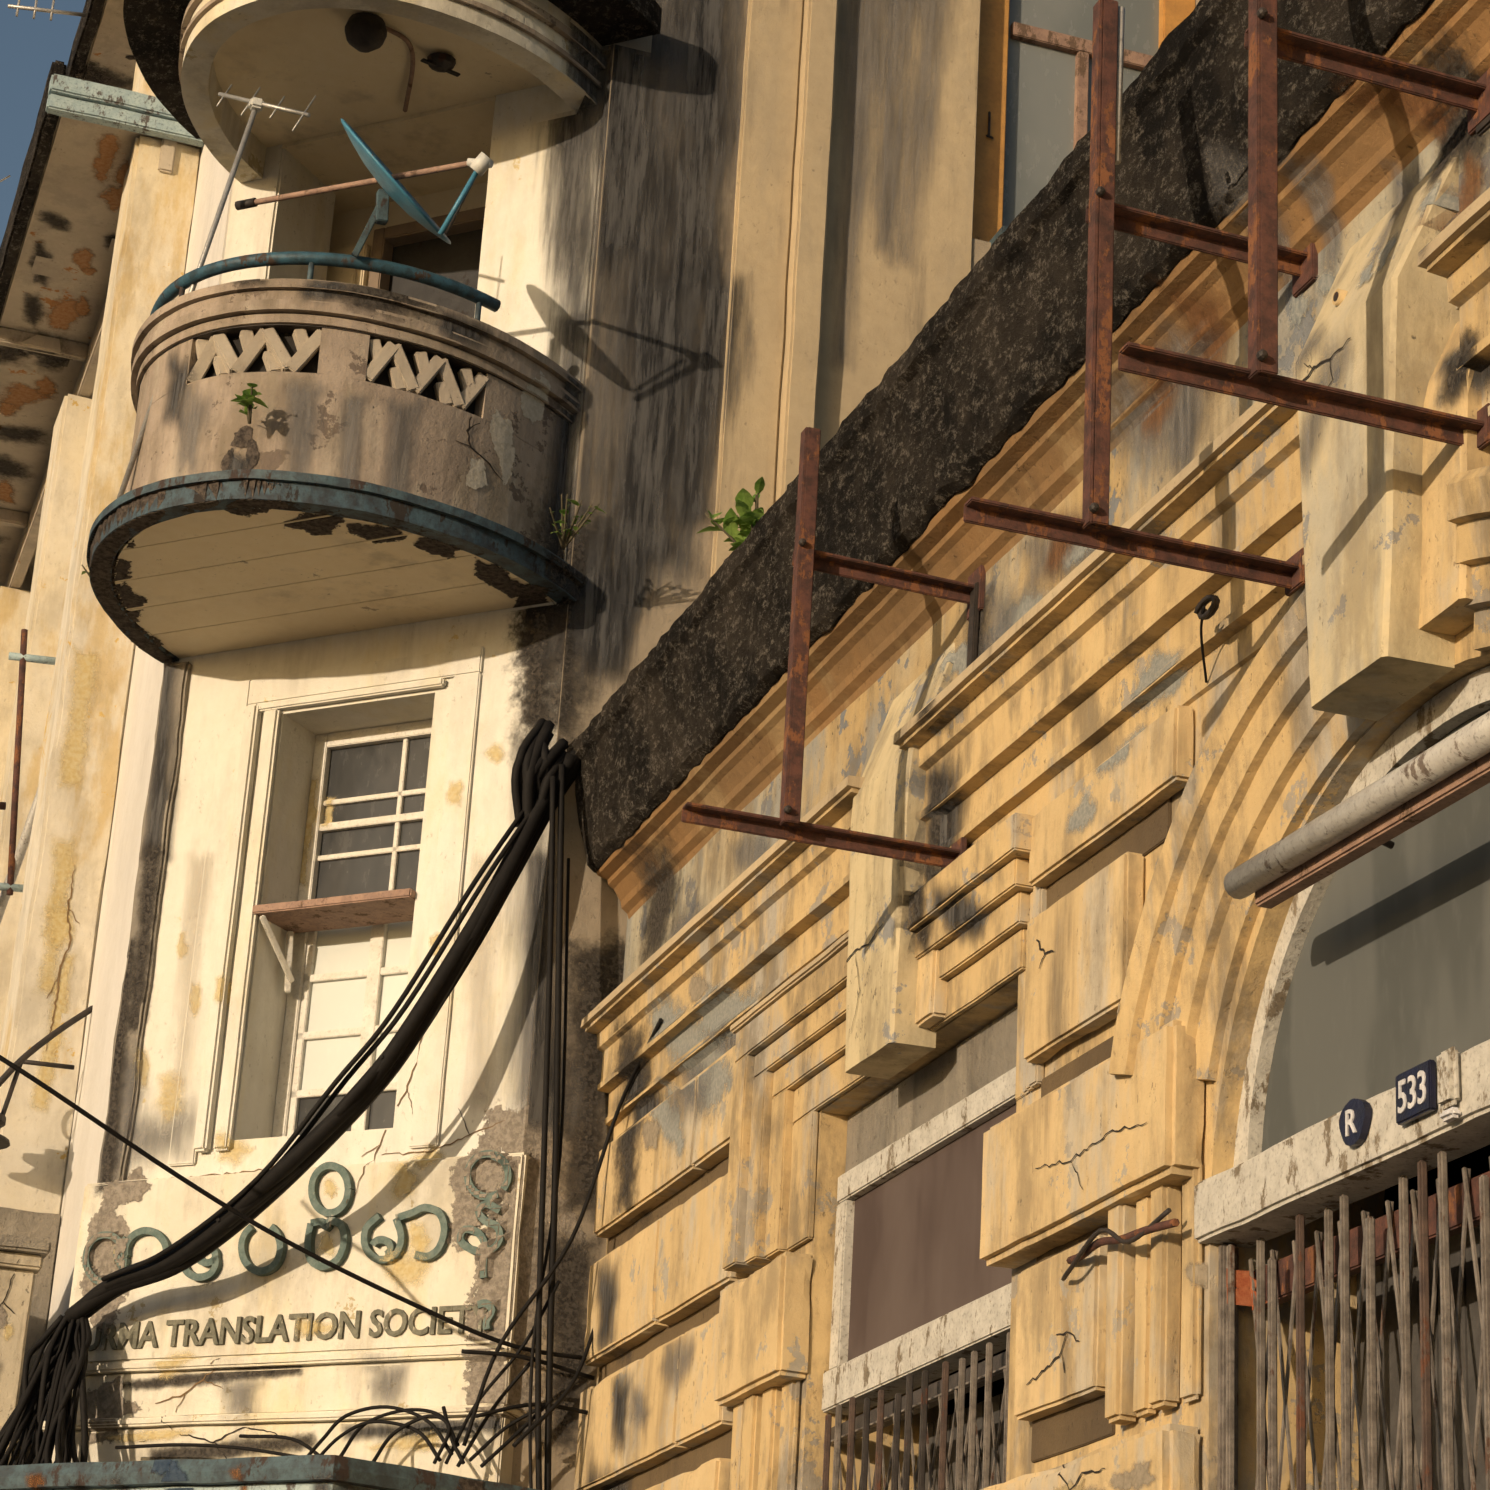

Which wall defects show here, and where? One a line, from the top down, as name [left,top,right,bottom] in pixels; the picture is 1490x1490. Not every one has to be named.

corrosion [1423,33,1481,82]
corrosion [1346,83,1489,214]
damp [514,0,741,743]
peeling [183,425,548,608]
peeling [87,490,175,676]
crack [46,865,79,1050]
crack [1035,1122,1147,1190]
peeling [79,1166,151,1296]
peeling [395,1105,590,1429]
damp [612,1377,628,1446]
crack [1026,1331,1079,1385]
damp [589,1472,627,1490]